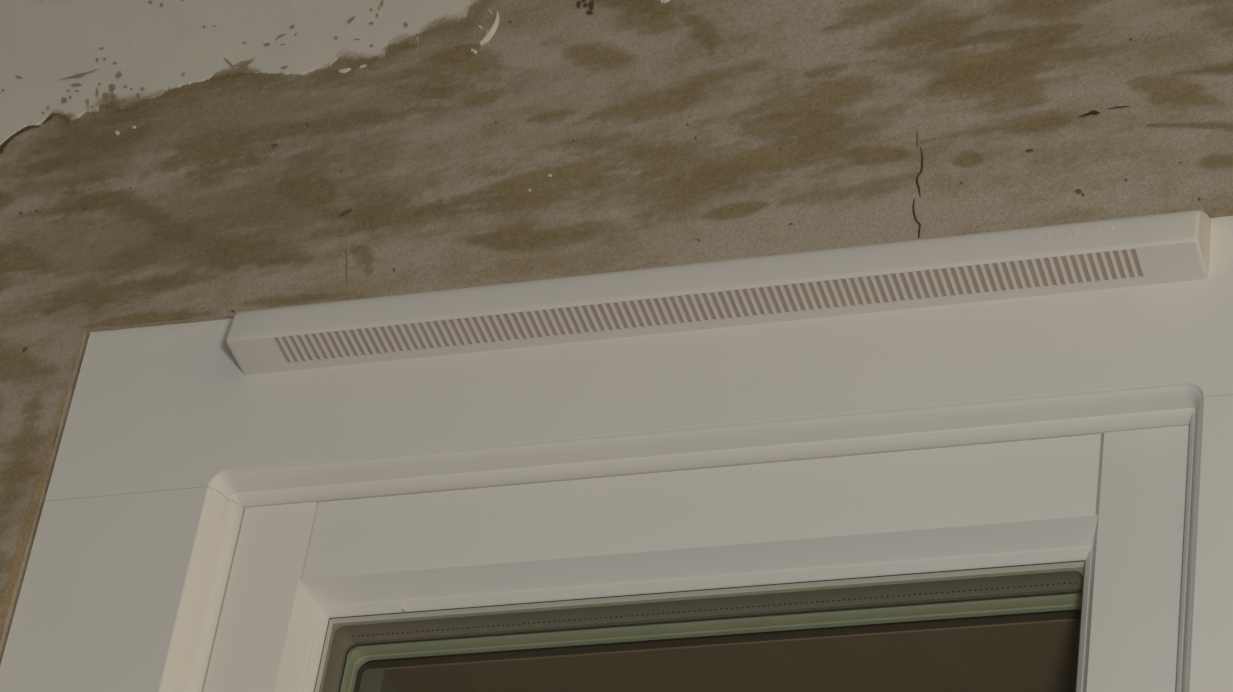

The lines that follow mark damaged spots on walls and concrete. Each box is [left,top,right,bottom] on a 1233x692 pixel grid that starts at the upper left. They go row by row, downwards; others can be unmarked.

spalling [0,113,69,153]
water stain [31,72,291,171]
water stain [167,45,500,175]
peeling [471,8,500,54]
water stain [316,62,915,235]
crack [912,134,923,238]
water stain [881,0,1100,133]
water stain [98,312,201,326]